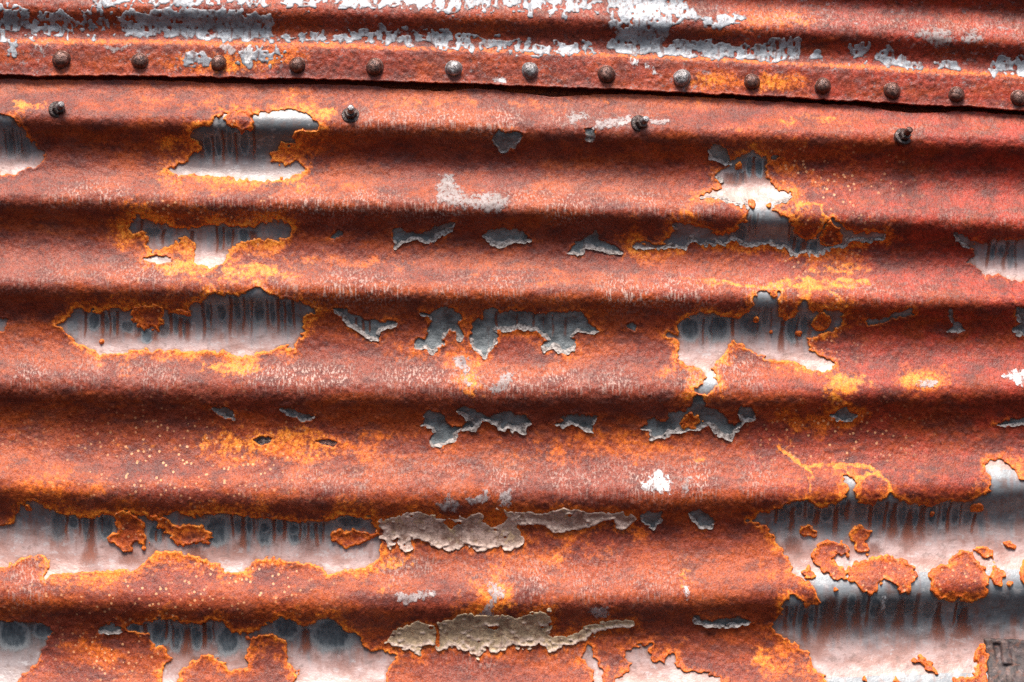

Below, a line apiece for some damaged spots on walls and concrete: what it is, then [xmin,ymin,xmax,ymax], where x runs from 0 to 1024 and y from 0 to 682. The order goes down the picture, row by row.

peeling [0,115,45,175]
peeling [169,108,319,182]
peeling [567,143,886,257]
peeling [129,214,292,269]
peeling [57,287,316,357]
peeling [414,306,599,386]
peeling [640,290,843,442]
peeling [420,406,532,448]
peeling [0,488,663,579]
peeling [745,459,1024,682]
peeling [0,620,52,682]
peeling [98,607,635,682]